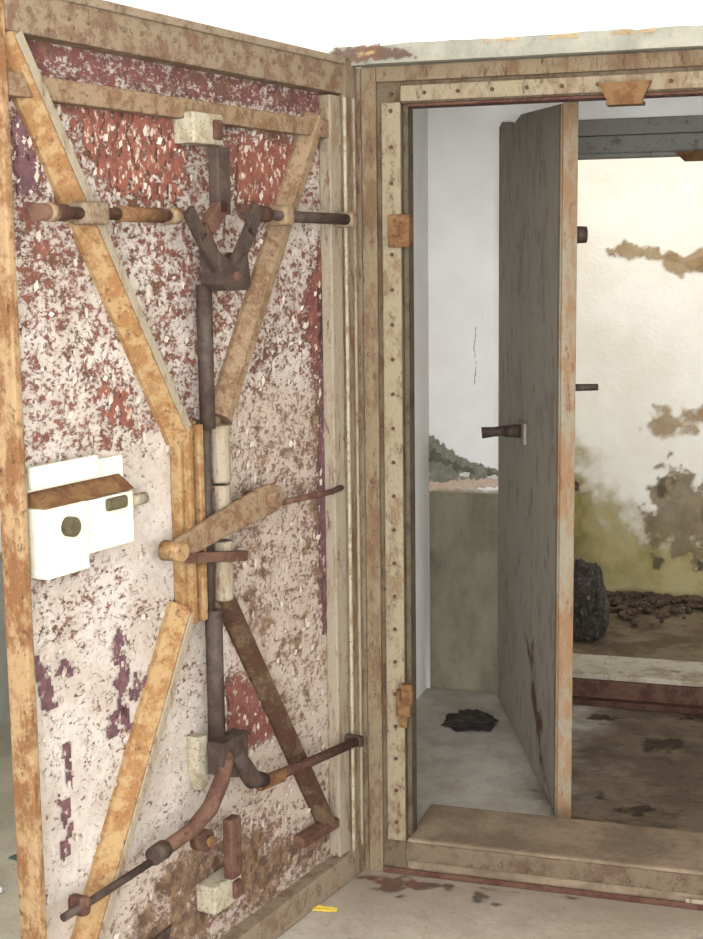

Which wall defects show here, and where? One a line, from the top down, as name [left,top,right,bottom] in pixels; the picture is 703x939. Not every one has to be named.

peeling [12,114,44,197]
peeling [56,104,193,211]
peeling [225,131,293,229]
peeling [98,341,147,457]
peeling [34,645,75,731]
peeling [46,741,79,865]